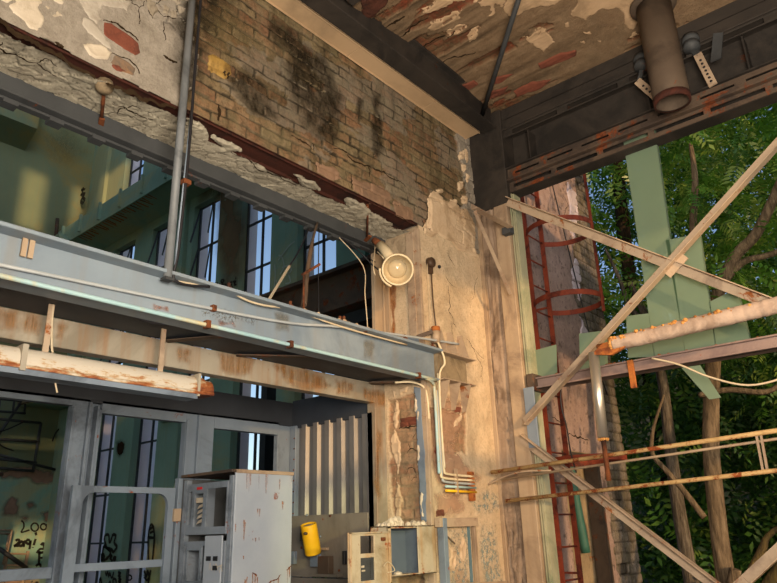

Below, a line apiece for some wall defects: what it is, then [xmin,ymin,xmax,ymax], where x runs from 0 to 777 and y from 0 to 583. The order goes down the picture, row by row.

peeling [2,0,64,30]
crack [0,18,176,120]
peeling [79,0,140,75]
crack [131,0,178,63]
mould [232,73,274,116]
mould [271,24,340,139]
water stain [372,97,383,157]
peeling [421,0,560,42]
rust [653,86,692,113]
flaking render [344,177,414,227]
flaking render [423,148,477,258]
peeling [391,386,445,522]